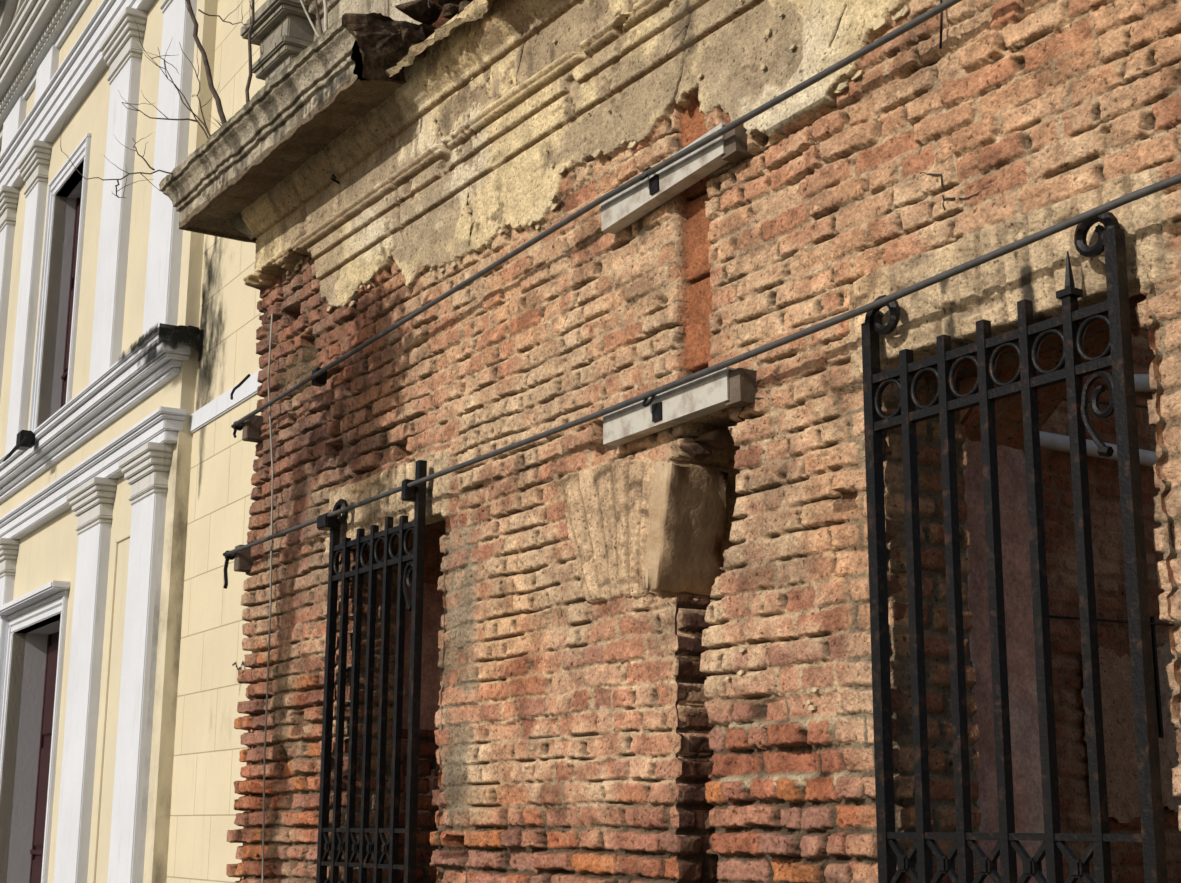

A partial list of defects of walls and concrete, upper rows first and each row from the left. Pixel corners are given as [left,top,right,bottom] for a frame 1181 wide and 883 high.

peeling [508,20,559,82]
peeling [433,77,483,135]
flaking render [245,103,670,368]
leakage [121,236,223,410]
spalling [392,439,413,461]
spalling [591,419,621,457]
spalling [832,485,860,513]